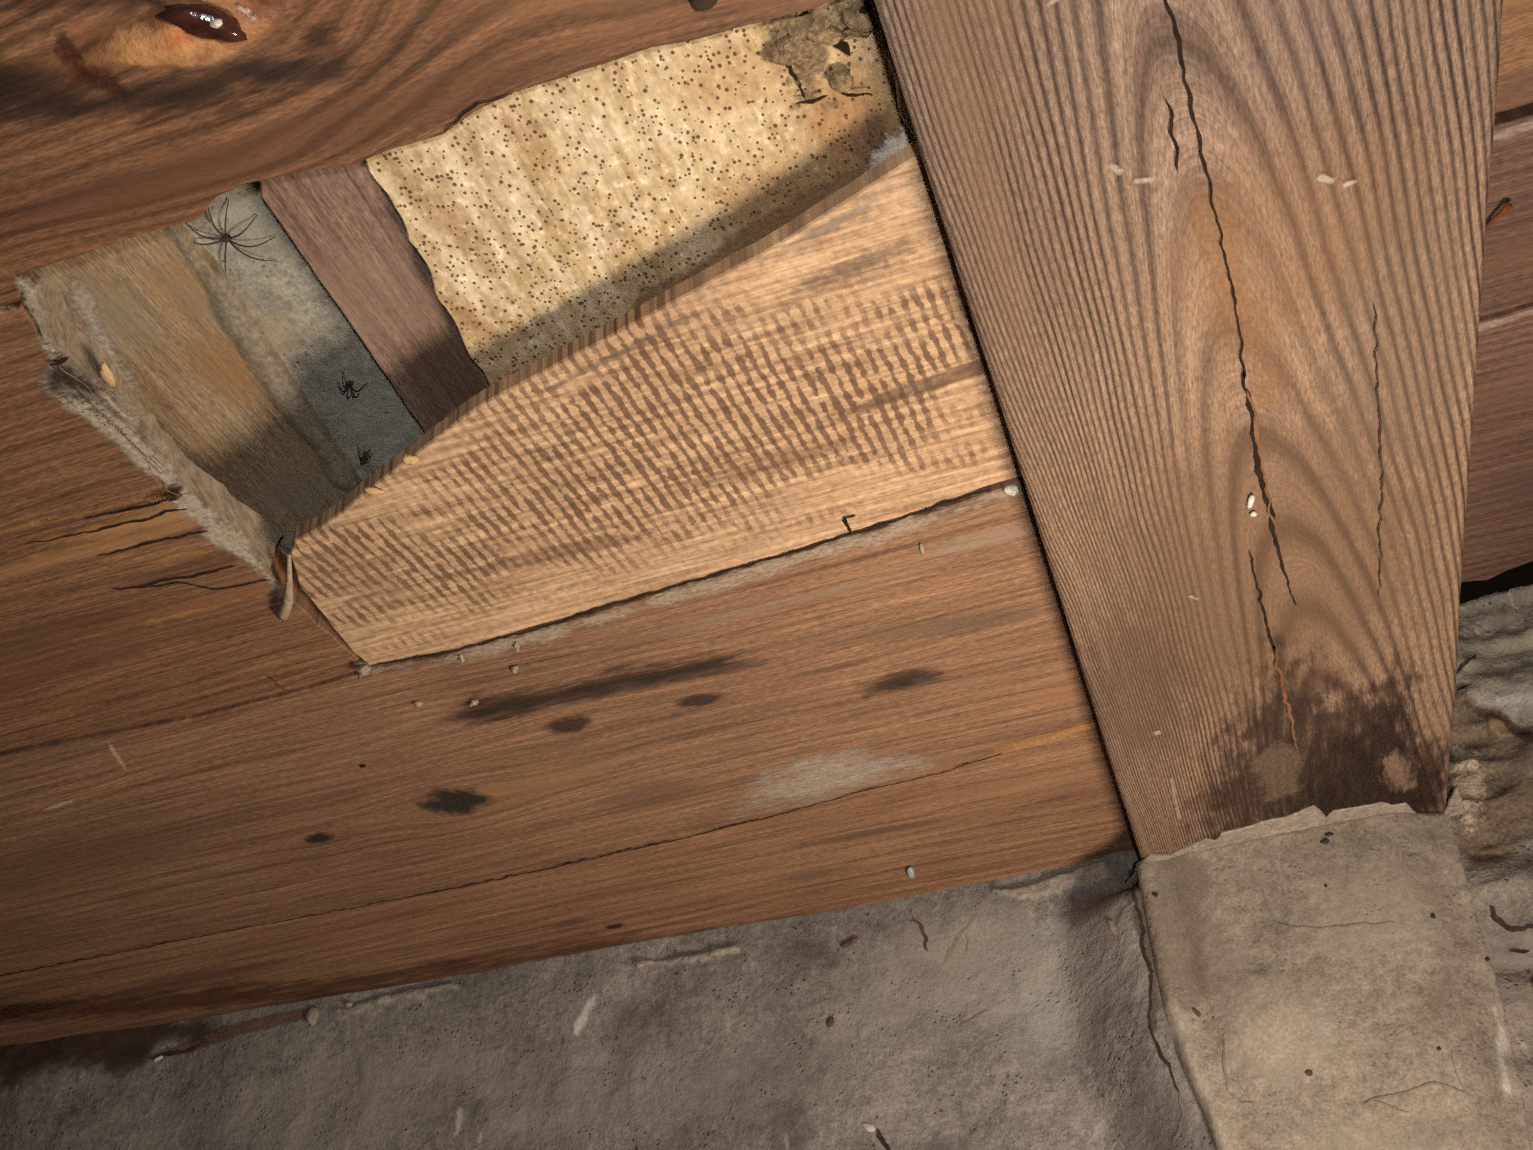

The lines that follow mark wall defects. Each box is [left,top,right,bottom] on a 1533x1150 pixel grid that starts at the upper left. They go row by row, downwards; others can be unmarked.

water stain [462,657,731,725]
water stain [867,670,940,698]
water stain [1207,658,1448,840]
crack [1116,866,1185,1147]